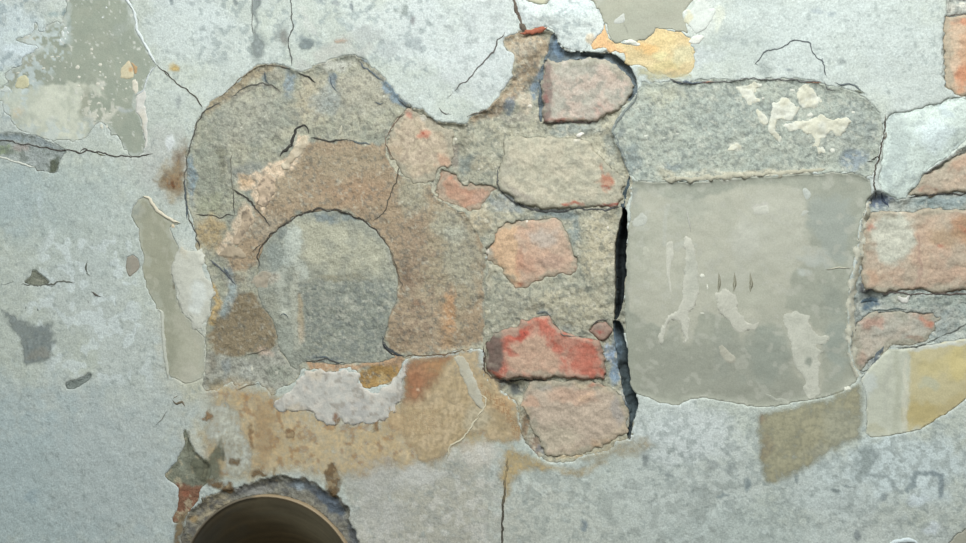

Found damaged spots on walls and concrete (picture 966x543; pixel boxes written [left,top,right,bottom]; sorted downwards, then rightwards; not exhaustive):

crack [0,140,149,158]
peeling [0,0,157,173]
crack [439,0,527,117]
peeling [591,0,716,54]
crack [669,40,863,93]
peeling [736,81,855,154]
spalling [931,147,966,172]
spalling [126,26,647,463]
crack [497,33,639,439]
peeling [760,191,966,482]
spalling [165,430,207,523]
crack [500,461,508,543]